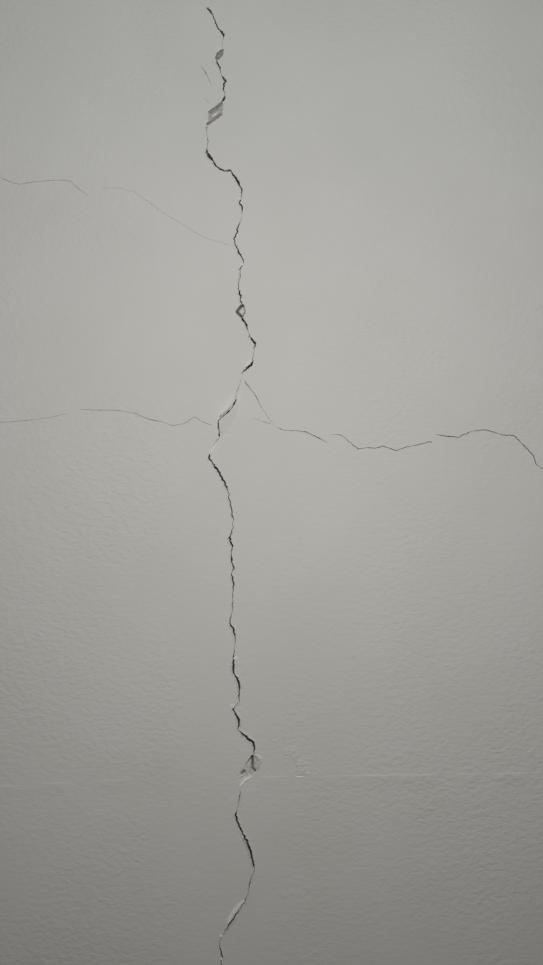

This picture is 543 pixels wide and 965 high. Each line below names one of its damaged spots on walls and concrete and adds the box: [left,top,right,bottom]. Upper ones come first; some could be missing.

crack [0,0,543,470]
crack [0,408,257,755]
crack [217,789,257,965]